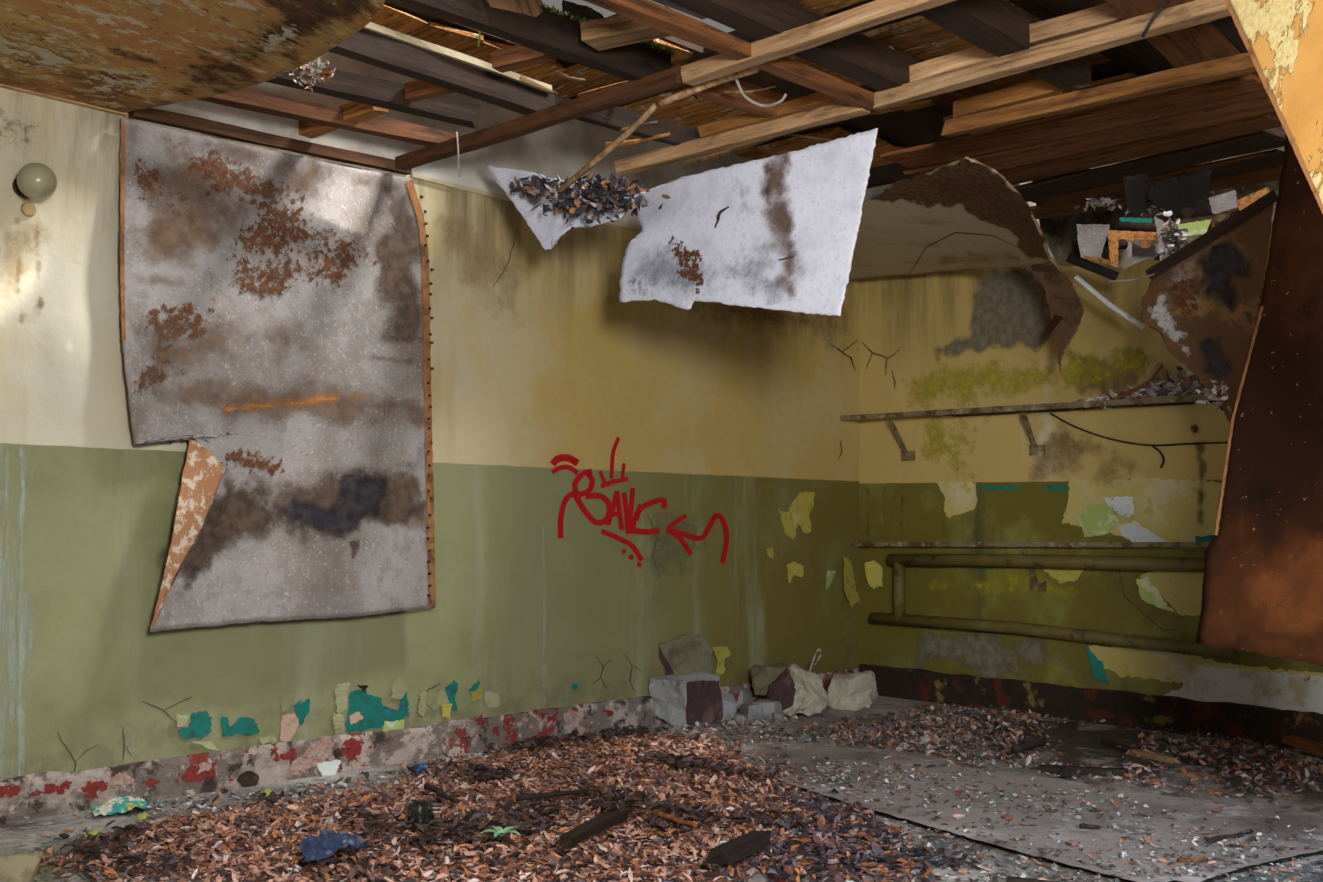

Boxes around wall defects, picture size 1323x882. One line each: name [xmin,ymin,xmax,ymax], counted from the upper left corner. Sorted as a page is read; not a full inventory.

peeling [668,236,704,294]
peeling [779,491,815,539]
peeling [935,481,1021,518]
peeling [1044,477,1222,542]
peeling [787,562,804,583]
peeling [826,557,883,607]
peeling [1043,568,1084,584]
peeling [1135,571,1204,616]
peeling [1085,645,1323,714]
peeling [0,676,500,821]